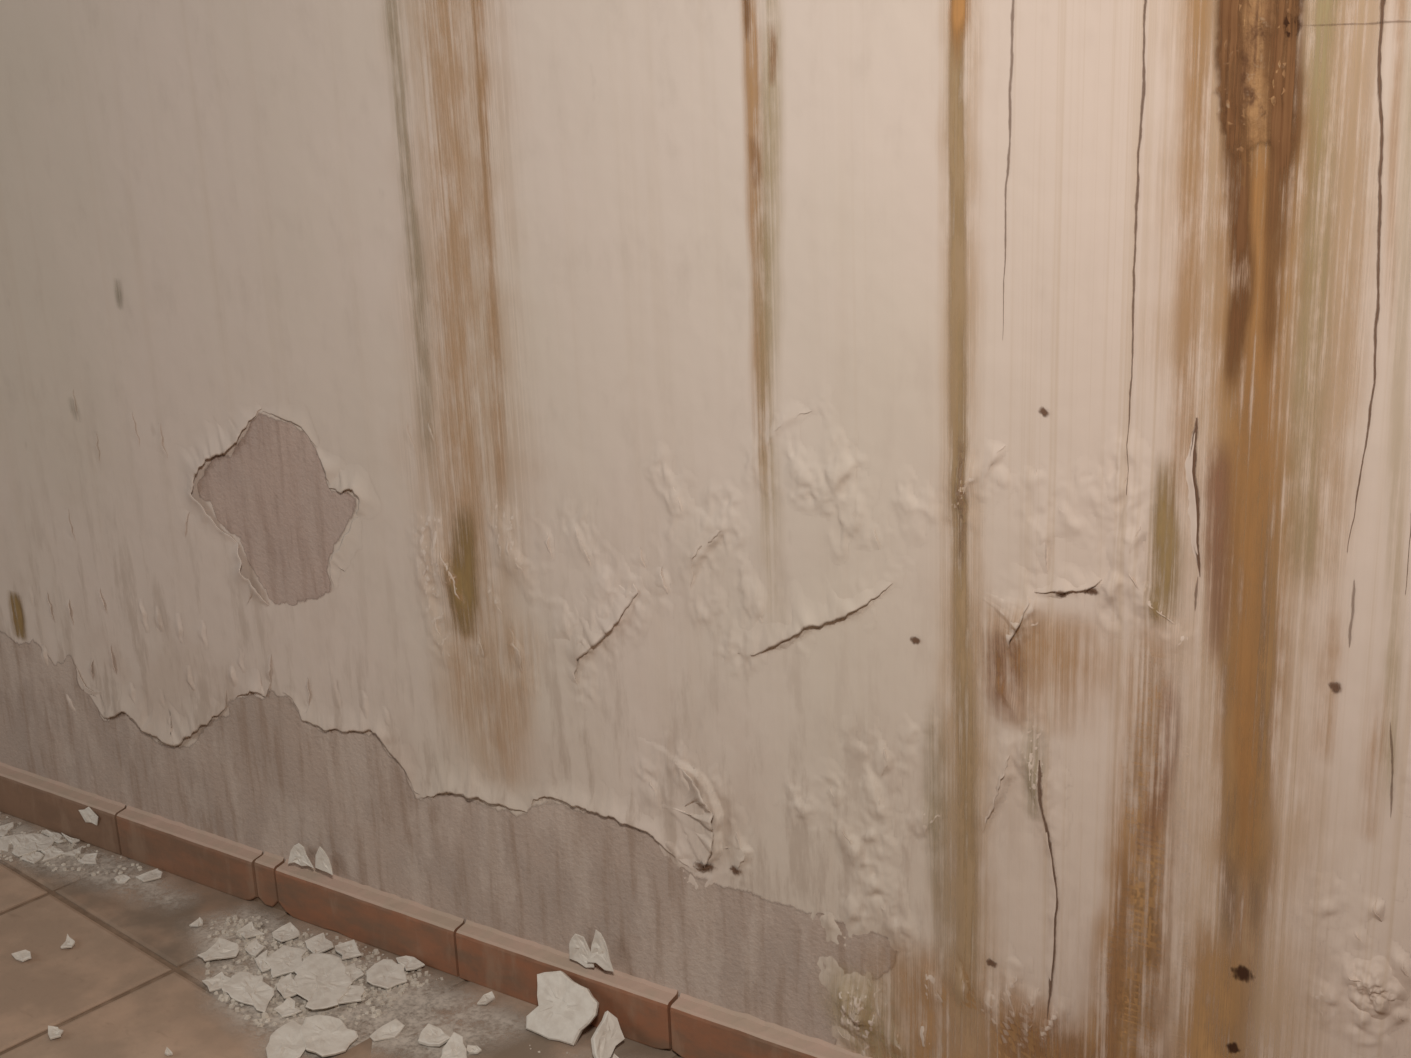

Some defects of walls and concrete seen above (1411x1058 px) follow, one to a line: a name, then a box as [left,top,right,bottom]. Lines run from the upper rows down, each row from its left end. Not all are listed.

peeling [172,396,382,608]
damp [449,520,475,633]
peeling [549,536,654,719]
peeling [709,553,921,681]
rust [932,0,978,1053]
peeling [0,584,897,1045]
crack [1037,760,1058,1018]
peeling [467,1045,482,1054]